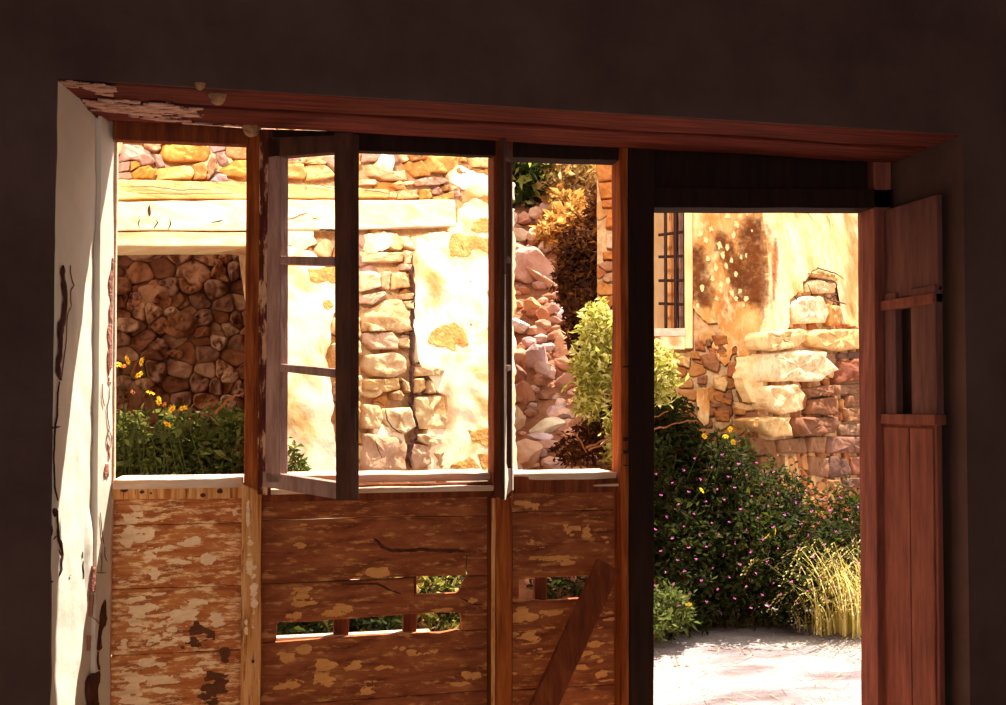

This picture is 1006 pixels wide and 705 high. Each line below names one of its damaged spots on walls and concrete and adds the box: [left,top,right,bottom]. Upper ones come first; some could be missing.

peeling [61,80,241,127]
spalling [448,217,488,257]
peeling [696,213,749,309]
crack [371,265,429,468]
spalling [428,322,469,351]
crack [49,265,107,584]
peeling [119,505,216,580]
crack [373,538,466,553]
crack [344,583,401,594]
spalling [85,566,107,705]
peeling [114,592,231,705]
peeling [273,644,362,690]